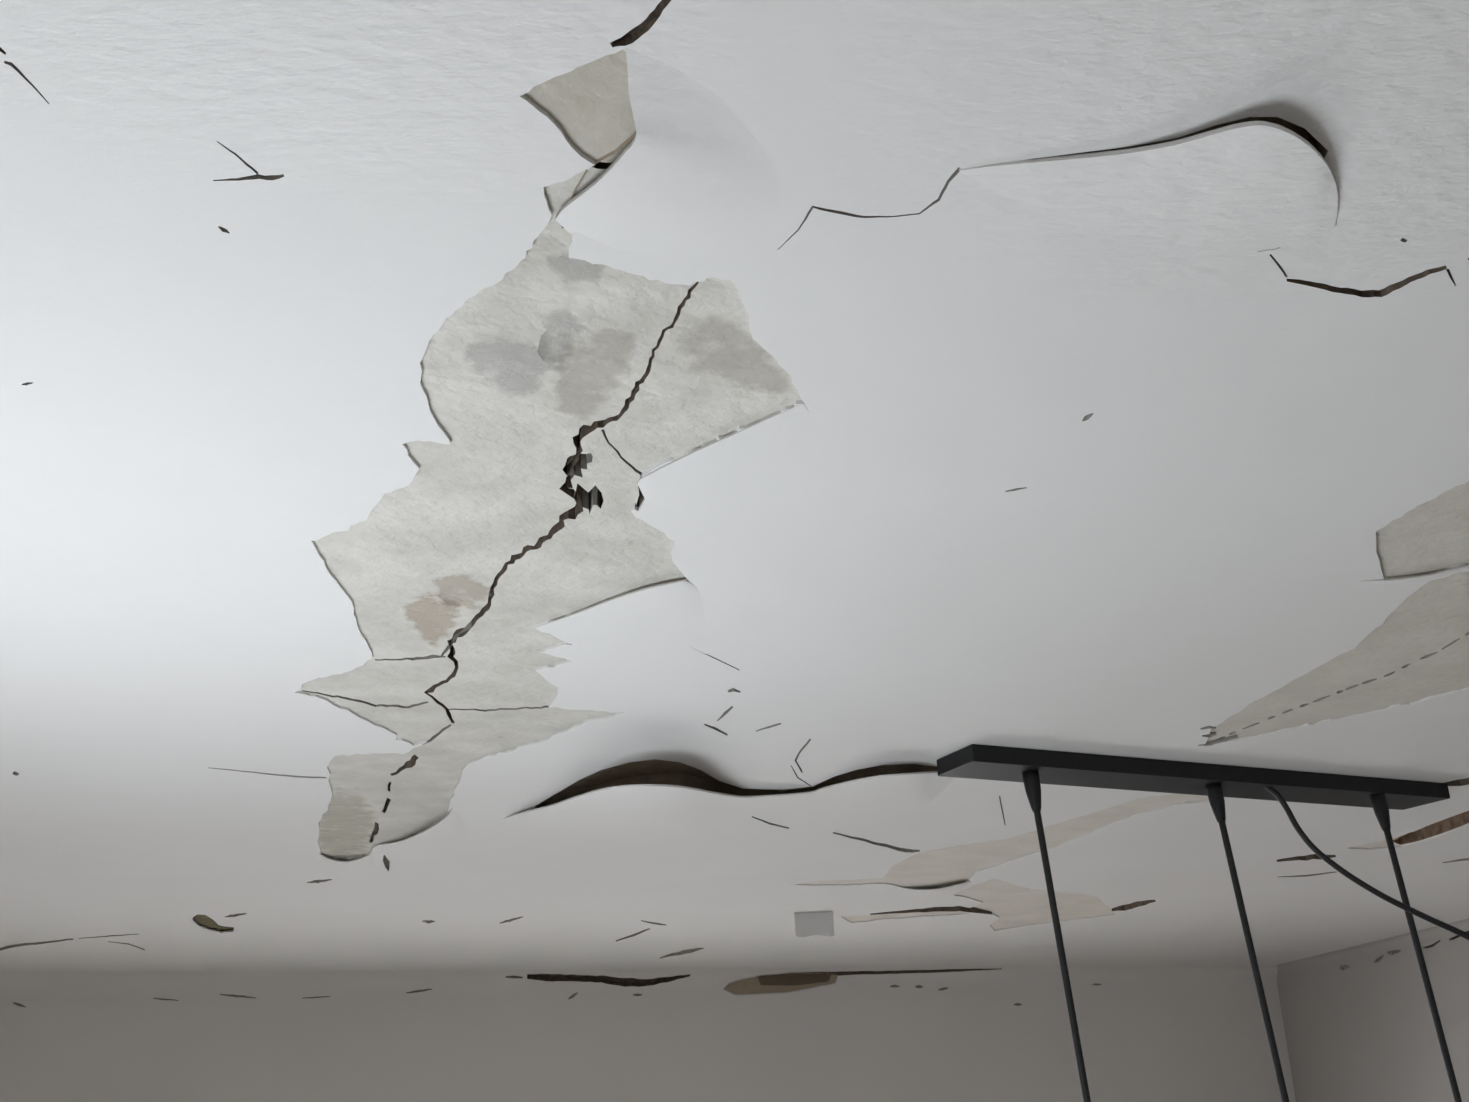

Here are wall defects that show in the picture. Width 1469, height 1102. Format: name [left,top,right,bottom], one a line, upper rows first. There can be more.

crack [612,0,671,47]
crack [0,47,49,104]
crack [213,141,284,181]
crack [1258,247,1455,297]
peeling [299,49,810,883]
crack [302,282,699,842]
peeling [1207,481,1469,741]
crack [693,648,811,787]
peeling [801,794,1209,930]
crack [505,920,704,987]
peeling [794,912,835,937]